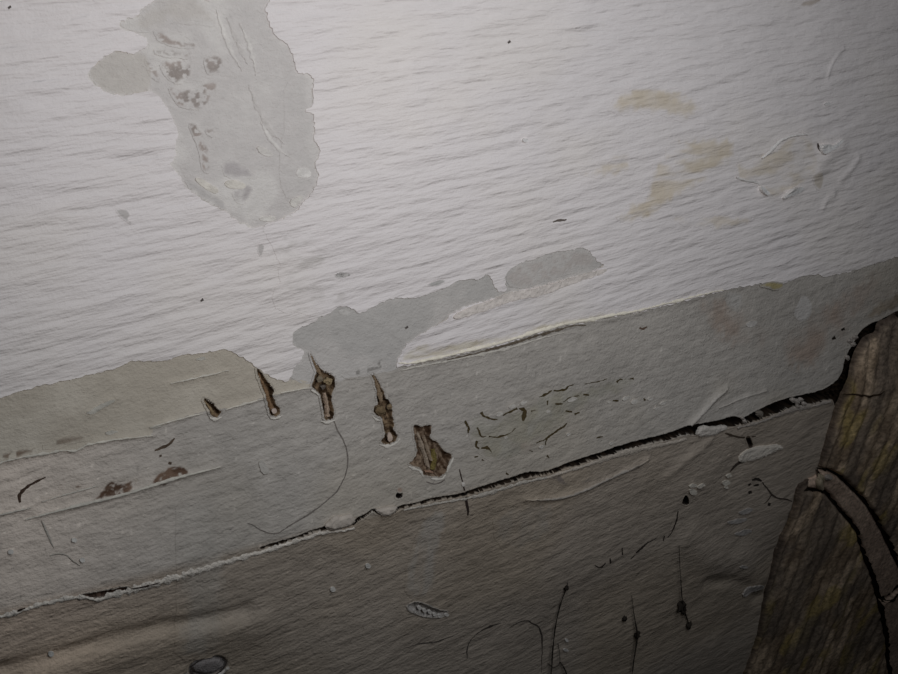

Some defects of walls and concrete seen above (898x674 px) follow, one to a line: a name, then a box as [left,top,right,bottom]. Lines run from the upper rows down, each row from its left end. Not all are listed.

peeling [87,0,320,228]
corrosion [94,465,189,500]
peeling [0,248,607,464]
spalling [408,423,454,481]
crack [0,310,898,618]
peeling [464,376,667,475]